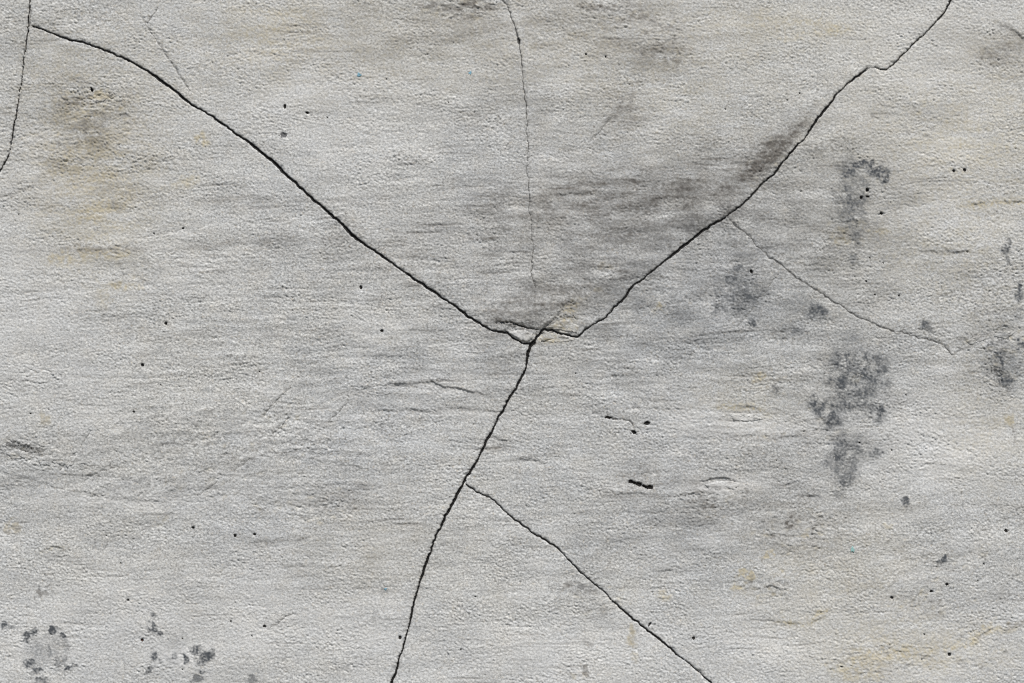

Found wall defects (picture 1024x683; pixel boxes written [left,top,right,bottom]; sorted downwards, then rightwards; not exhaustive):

crack [0,99,19,171]
crack [591,0,951,332]
crack [26,0,711,683]
damp [805,332,898,500]
crack [899,331,988,355]